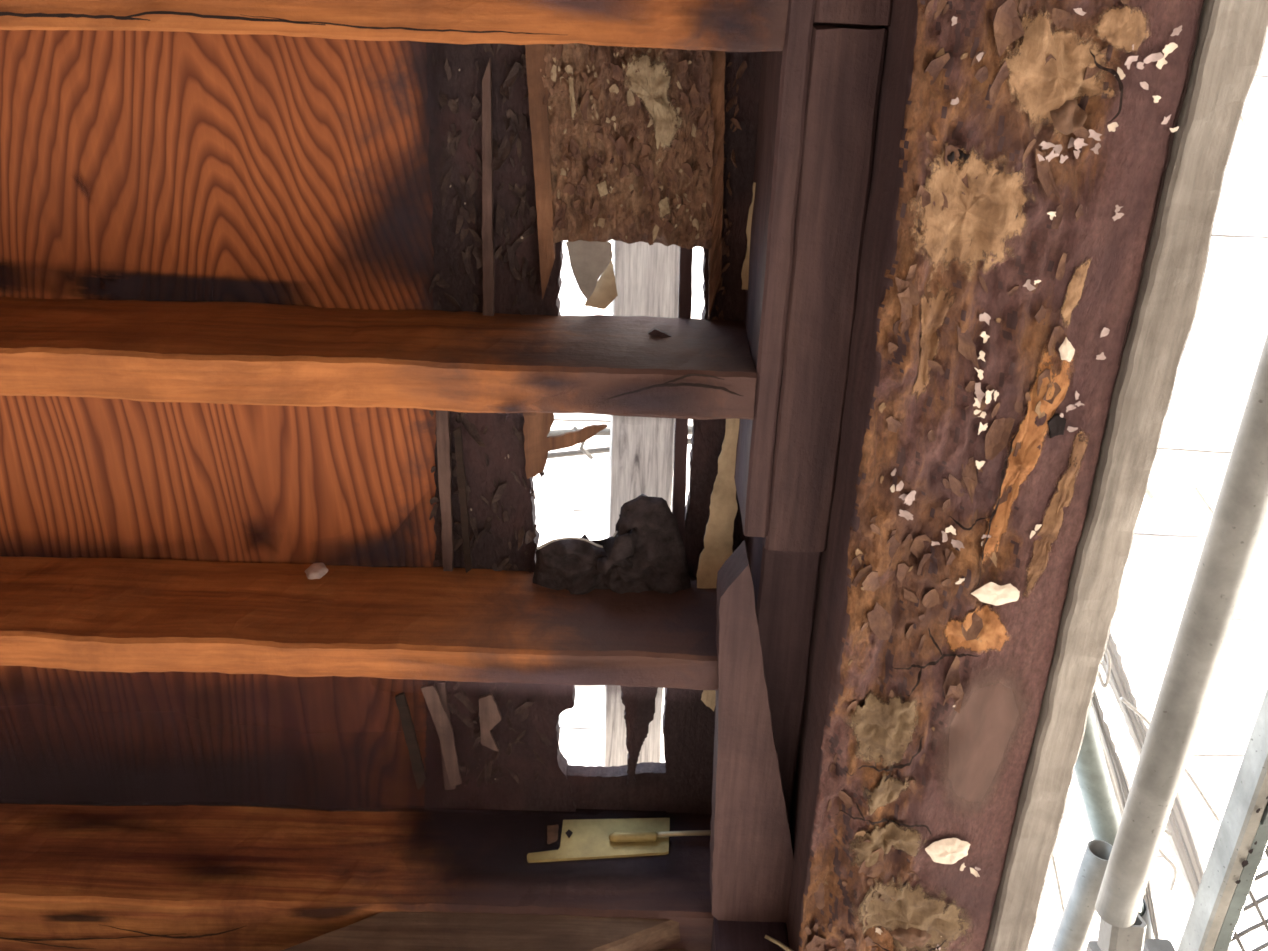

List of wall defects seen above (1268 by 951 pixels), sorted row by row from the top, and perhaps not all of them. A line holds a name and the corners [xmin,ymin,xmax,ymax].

crack [0,11,560,35]
peeling [850,0,1182,713]
crack [0,925,245,949]
peeling [804,677,981,951]